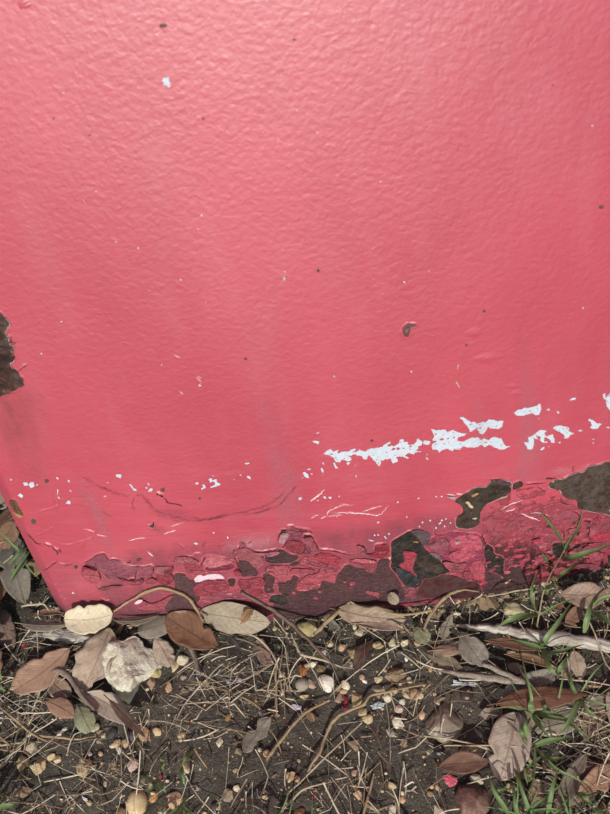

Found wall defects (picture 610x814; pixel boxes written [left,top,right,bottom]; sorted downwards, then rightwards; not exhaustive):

corrosion [0,310,26,398]
peeling [303,417,510,478]
peeling [513,404,560,419]
peeling [524,419,609,450]
peeling [74,488,610,620]